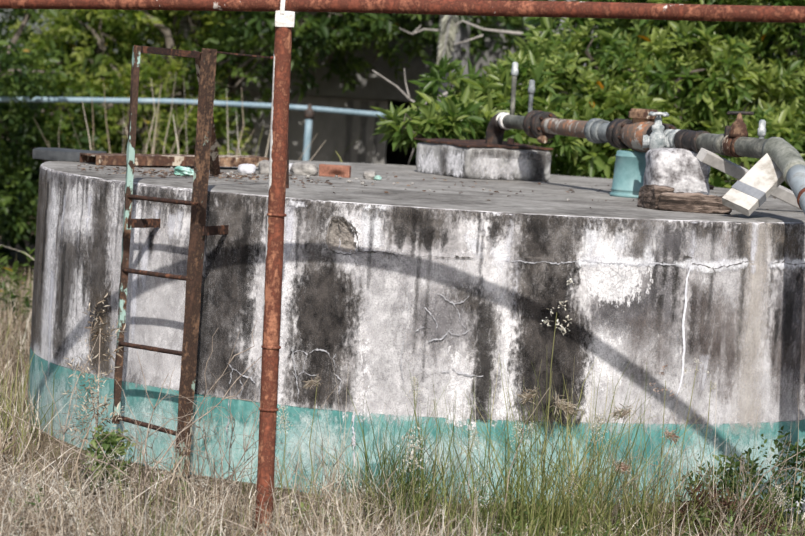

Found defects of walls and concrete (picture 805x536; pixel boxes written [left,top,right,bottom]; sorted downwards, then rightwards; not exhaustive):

water stain [31,166,192,376]
water stain [194,191,267,400]
peeling [283,202,527,472]
water stain [282,198,805,430]
crack [505,255,748,397]
crack [770,259,805,270]